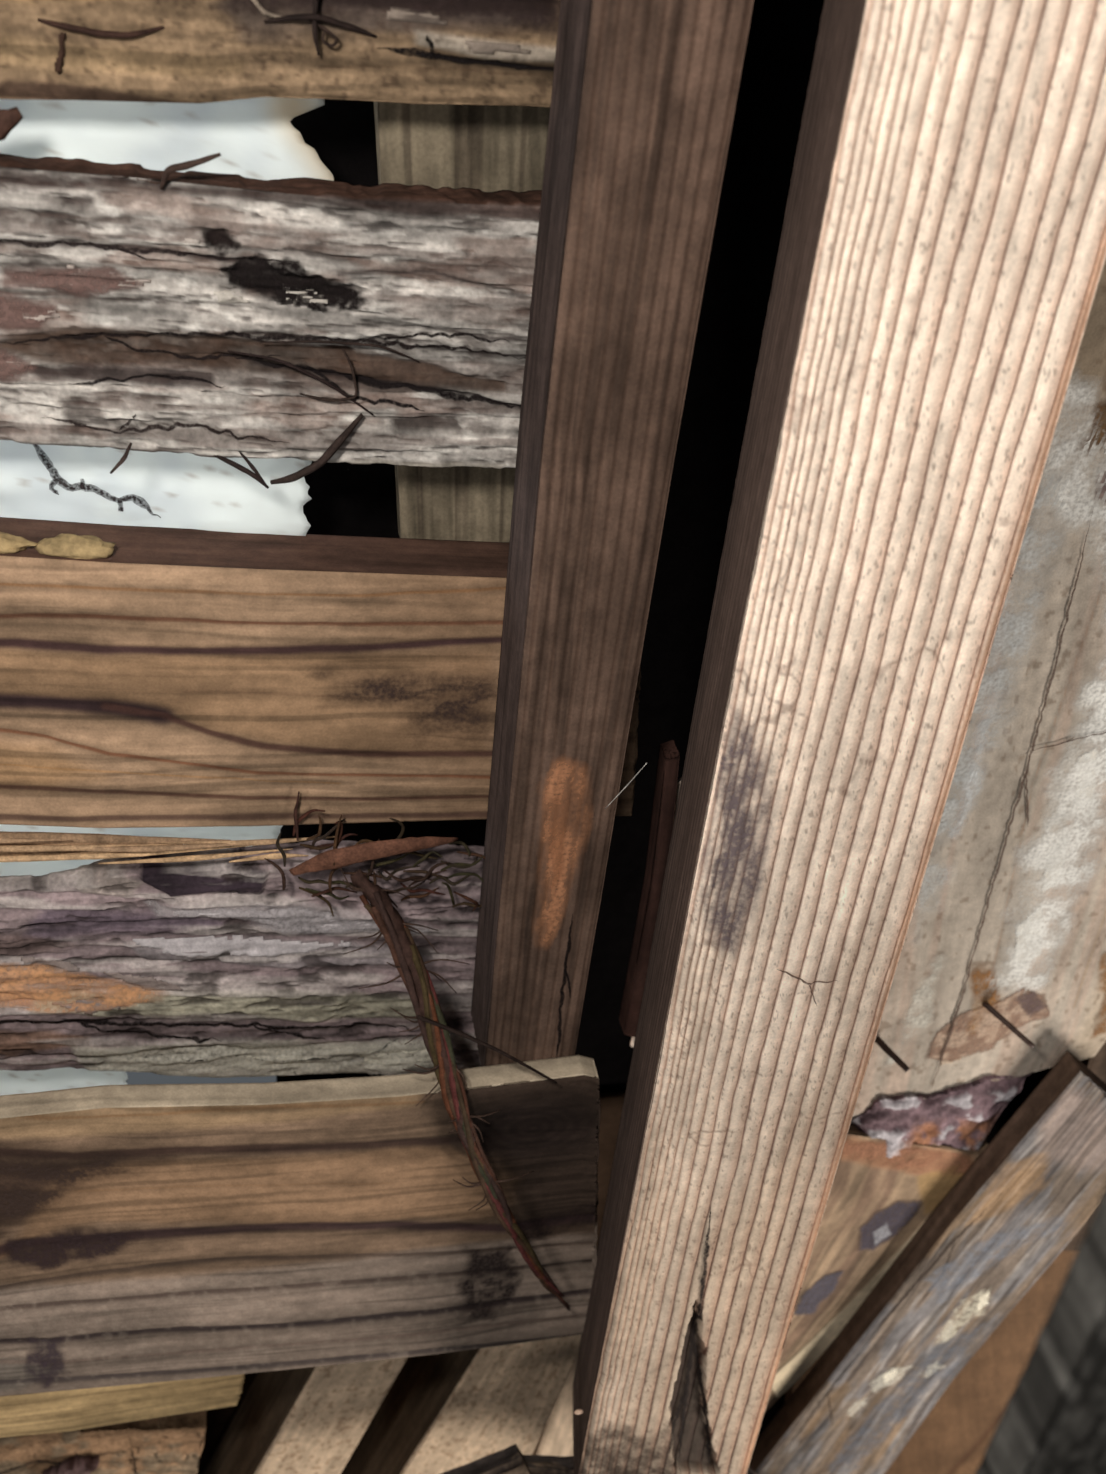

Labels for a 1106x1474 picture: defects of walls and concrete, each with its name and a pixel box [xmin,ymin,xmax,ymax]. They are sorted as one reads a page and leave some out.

crack [376,35,553,70]
crack [0,330,525,518]
damp [711,718,768,948]
crack [669,1206,712,1474]